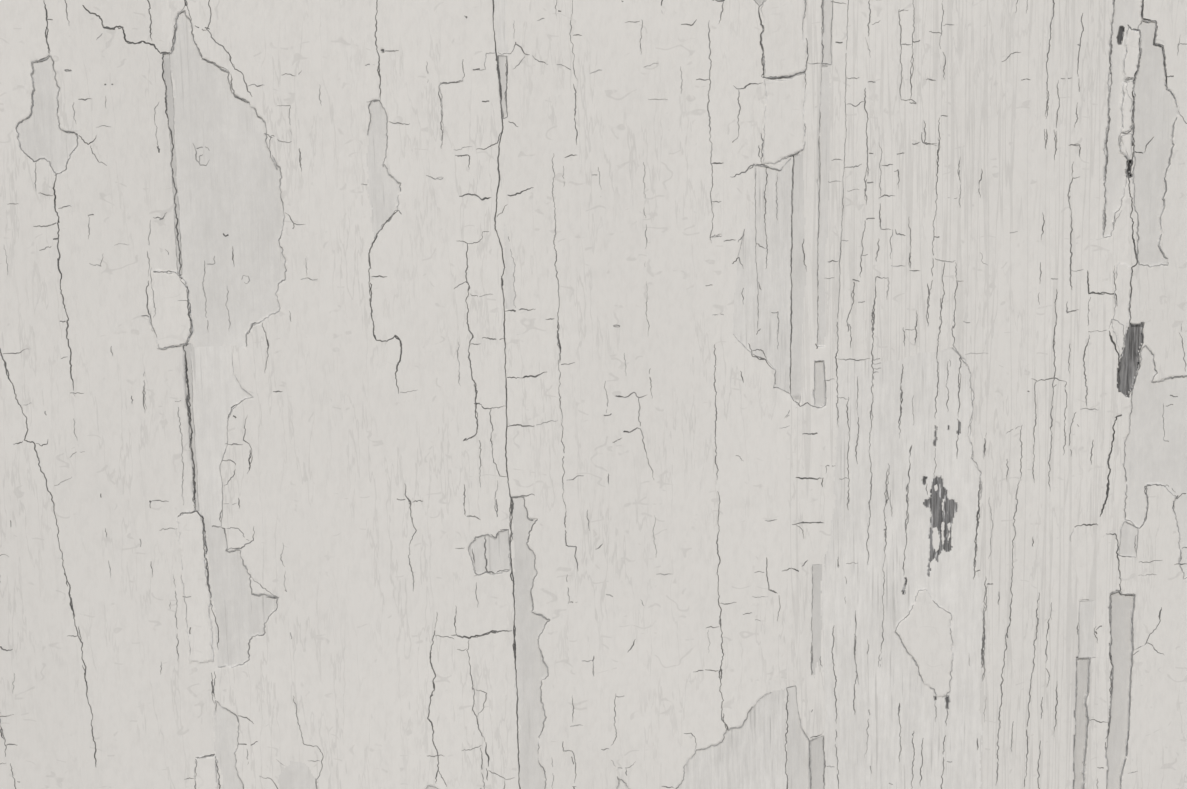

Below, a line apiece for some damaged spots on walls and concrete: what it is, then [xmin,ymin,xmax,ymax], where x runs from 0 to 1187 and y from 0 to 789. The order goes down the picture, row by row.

crack [365,0,409,125]
peeling [1102,0,1179,356]
peeling [149,10,287,668]
crack [368,210,416,394]
crack [397,485,422,589]
crack [426,0,609,789]
crack [604,281,654,479]
peeling [676,0,984,789]
peeling [1119,345,1187,579]
crack [0,646,18,789]
crack [187,696,324,789]
crack [551,695,636,789]